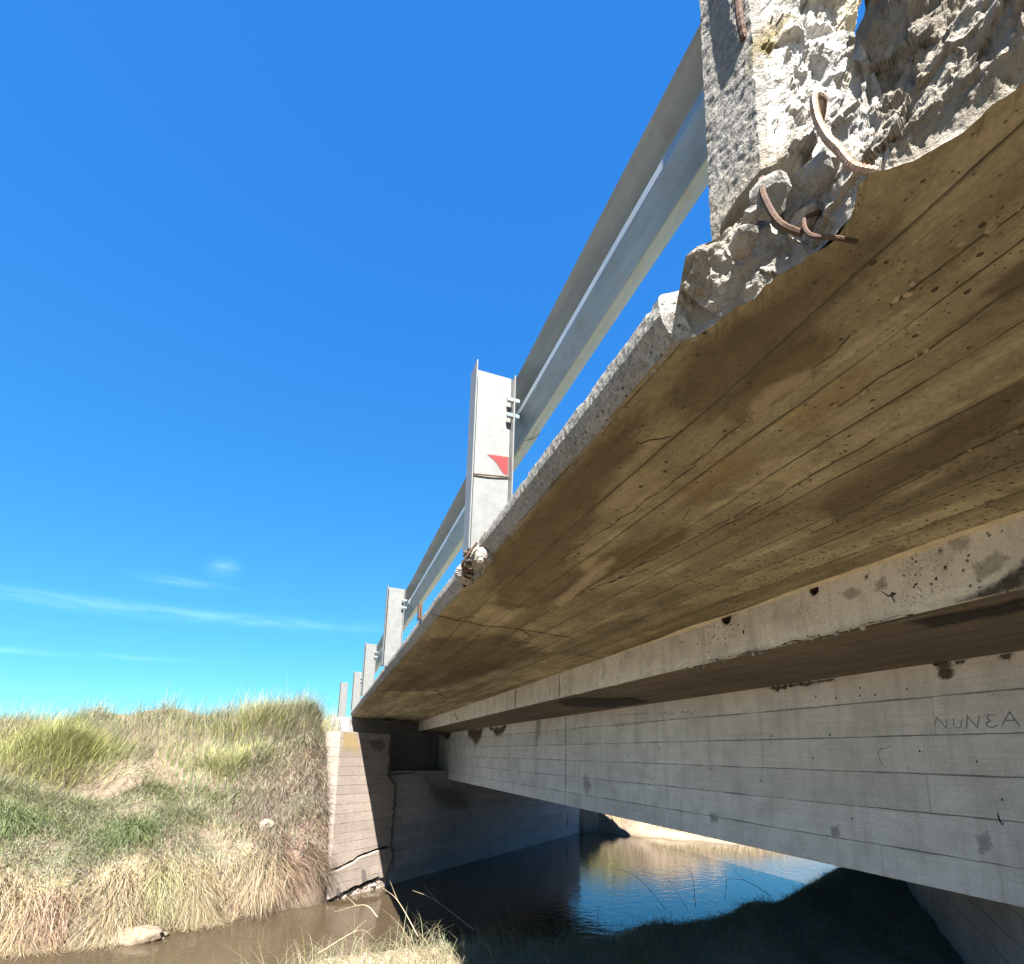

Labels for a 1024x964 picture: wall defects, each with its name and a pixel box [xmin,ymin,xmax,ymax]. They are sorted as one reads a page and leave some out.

spalling [676,0,1024,336]
spalling [454,542,495,586]
crack [323,730,416,902]